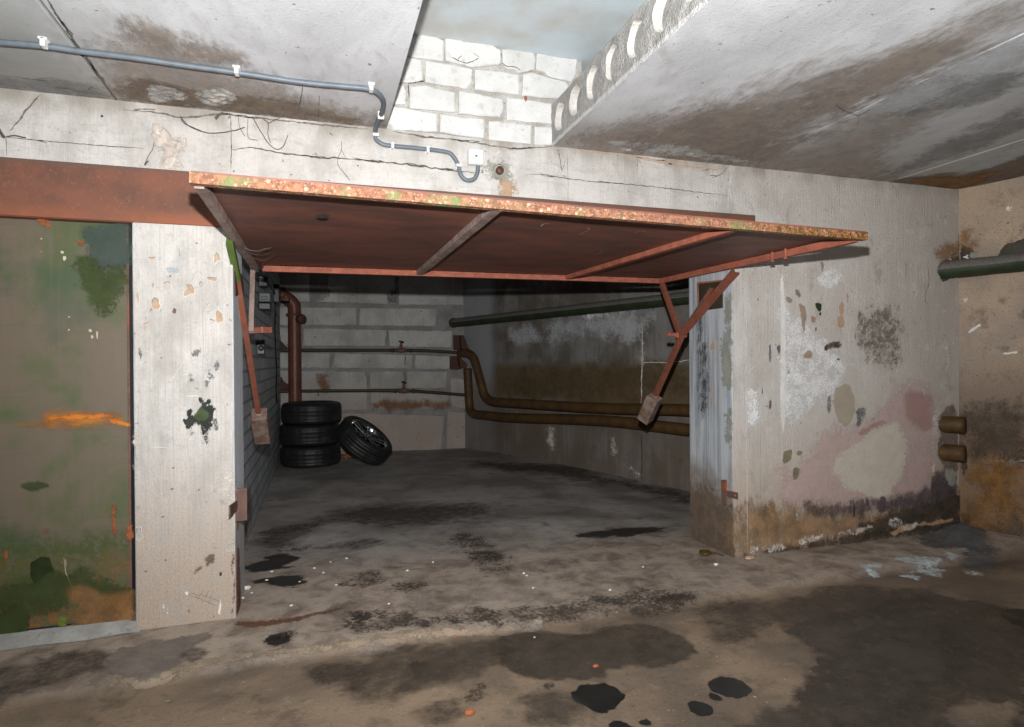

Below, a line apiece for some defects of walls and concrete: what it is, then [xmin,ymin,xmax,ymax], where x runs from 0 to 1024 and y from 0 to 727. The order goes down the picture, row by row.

damp [113,26,358,123]
crack [5,0,1012,206]
damp [583,8,1024,189]
spalling [136,252,220,325]
corrosion [28,413,130,428]
damp [805,403,1024,537]
corrosion [111,505,134,541]